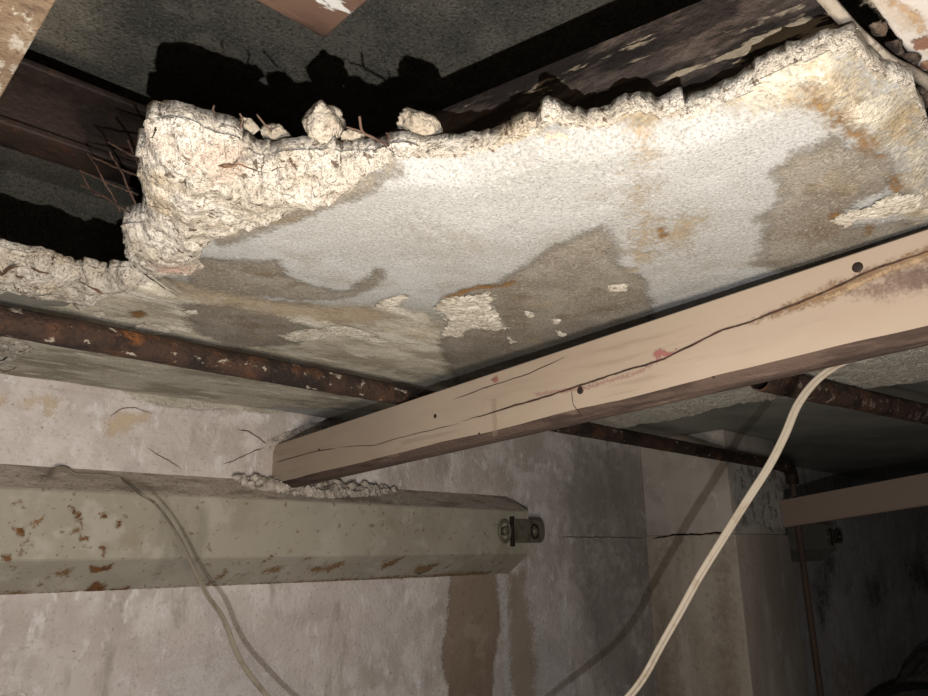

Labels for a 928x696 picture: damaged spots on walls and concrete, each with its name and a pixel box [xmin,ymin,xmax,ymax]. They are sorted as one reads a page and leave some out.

peeling [910,36,928,51]
water stain [727,50,928,272]
flaking render [0,117,420,318]
peeling [830,193,928,228]
water stain [0,227,657,392]
water stain [771,246,928,318]
water stain [0,339,395,414]
crack [224,251,928,464]
corrosion [68,505,90,541]
corrosion [0,546,159,595]
corrosion [242,554,503,585]
crack [562,531,722,539]